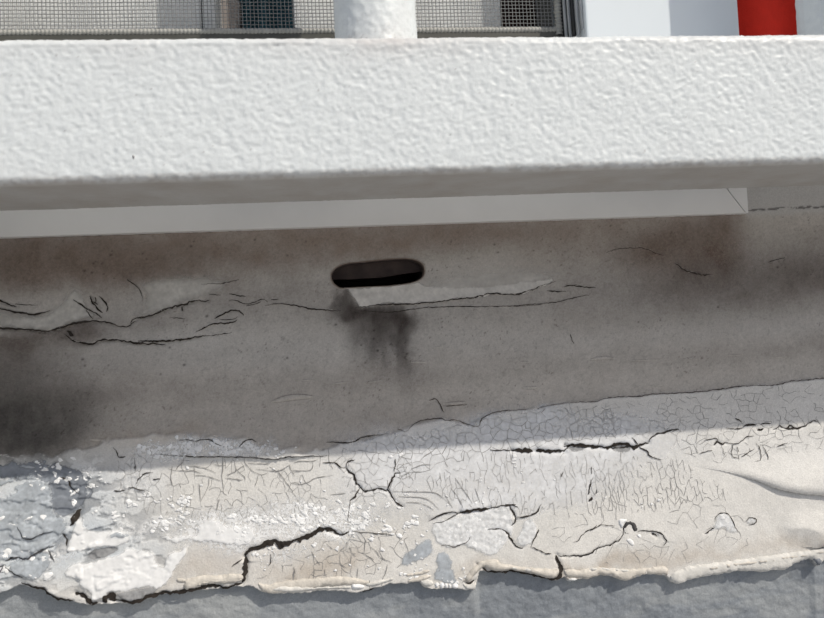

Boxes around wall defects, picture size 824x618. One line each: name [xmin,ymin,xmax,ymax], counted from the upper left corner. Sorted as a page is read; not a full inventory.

crack [0,279,596,345]
damp [340,292,413,350]
peeling [349,275,553,307]
spalling [0,461,93,580]
damp [0,399,660,601]
crack [0,387,824,605]
peeling [177,573,243,590]
peeling [258,576,393,593]